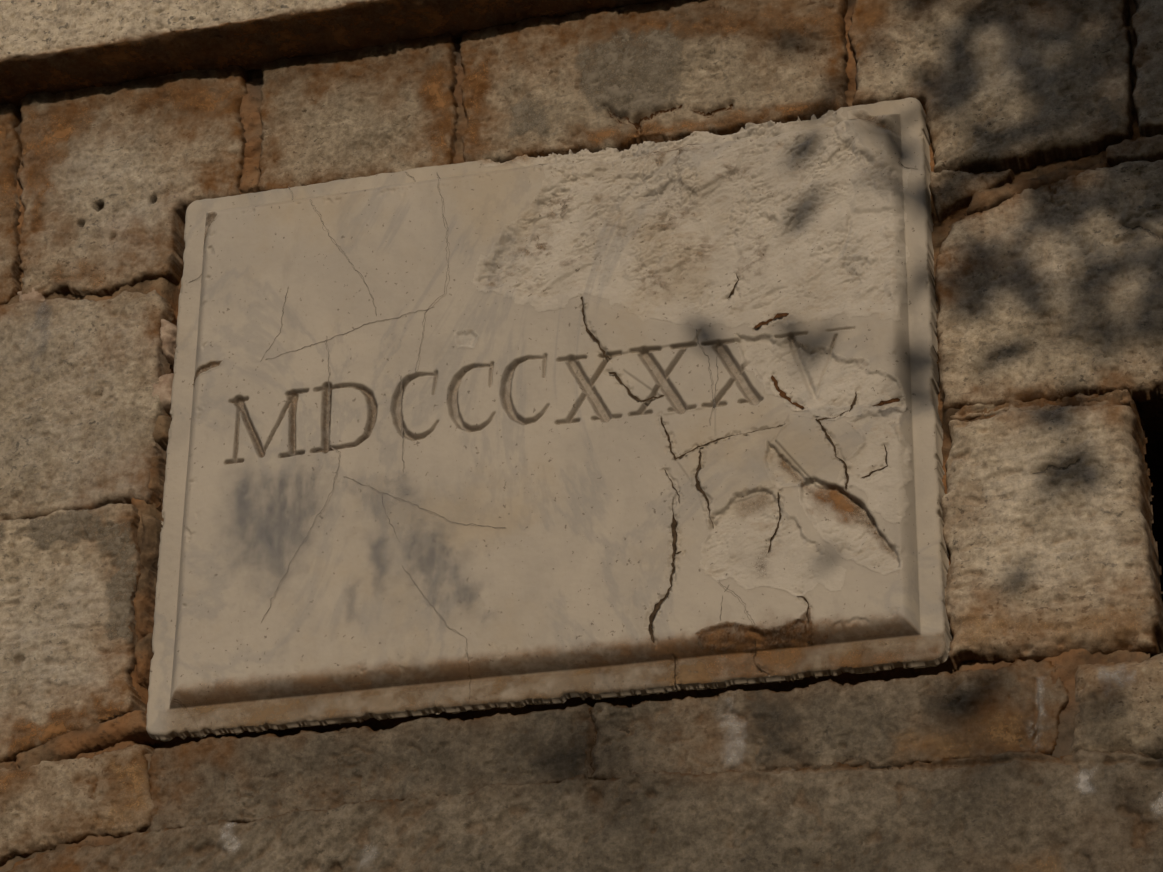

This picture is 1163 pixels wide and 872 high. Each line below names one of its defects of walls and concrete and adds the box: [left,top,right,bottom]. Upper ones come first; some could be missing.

crack [260,172,505,696]
spalling [472,107,914,654]
crack [580,297,900,687]